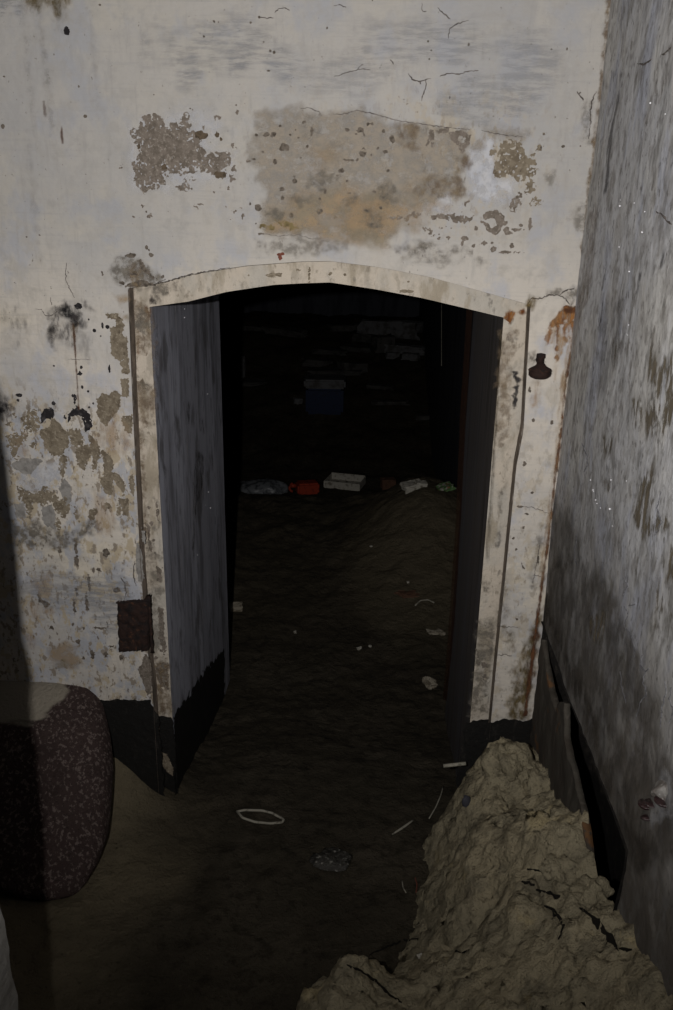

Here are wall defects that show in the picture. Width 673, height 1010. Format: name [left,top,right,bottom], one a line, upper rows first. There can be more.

crack [421,8,468,38]
flaking render [119,108,264,218]
spalling [255,121,314,165]
spalling [336,122,395,194]
flaking render [426,127,471,153]
flaking render [364,133,545,254]
spalling [119,245,164,288]
leakage [49,303,84,338]
corrosion [545,305,575,399]
flaking render [5,313,135,530]
spalling [71,539,107,644]
corrosion [523,414,563,716]